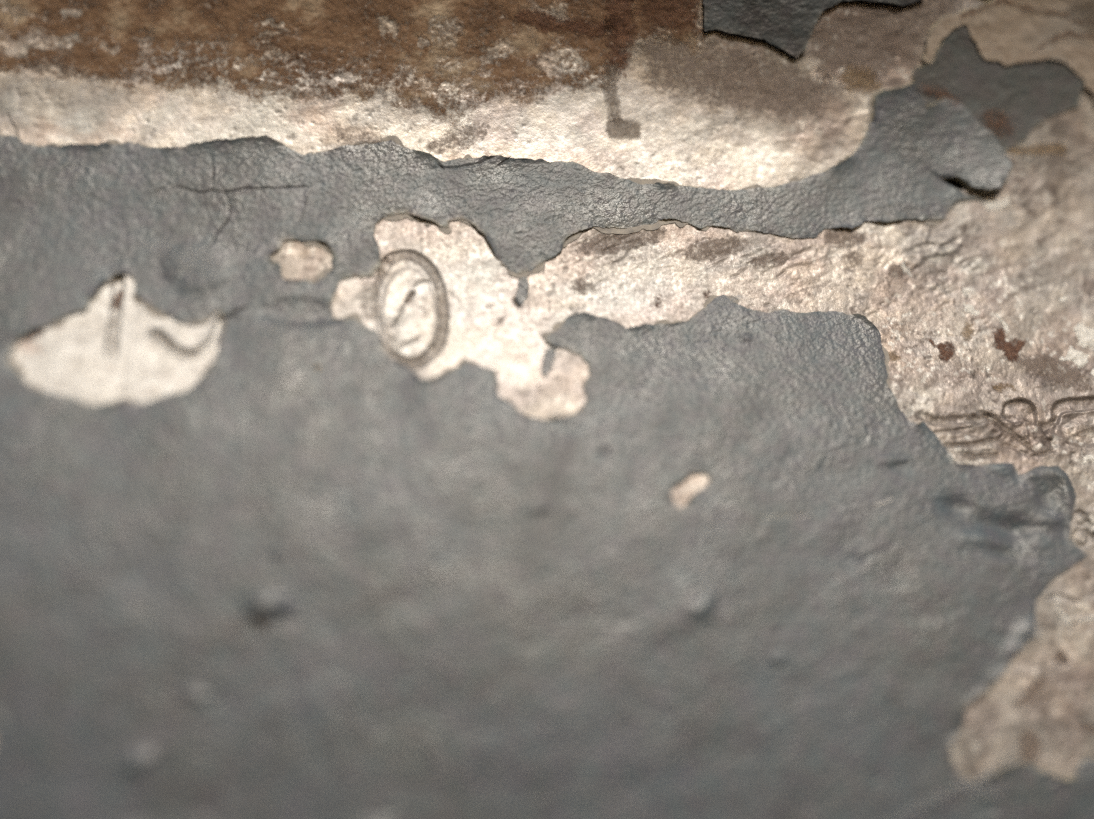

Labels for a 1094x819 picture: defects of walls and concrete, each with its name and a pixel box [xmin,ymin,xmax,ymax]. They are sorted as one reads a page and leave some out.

peeling [0,0,990,190]
crack [151,163,312,248]
peeling [272,241,332,280]
peeling [12,276,224,405]
peeling [331,87,1094,781]